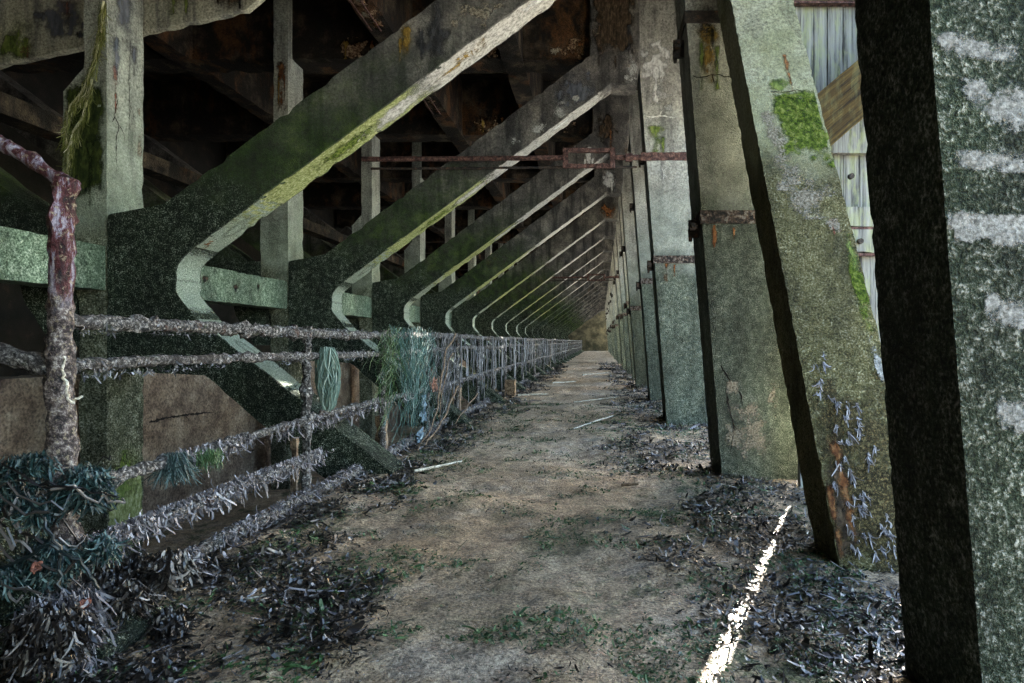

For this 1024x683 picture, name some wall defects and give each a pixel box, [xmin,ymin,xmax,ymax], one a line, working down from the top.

crack [721,366,743,447]
rust [825,430,861,560]